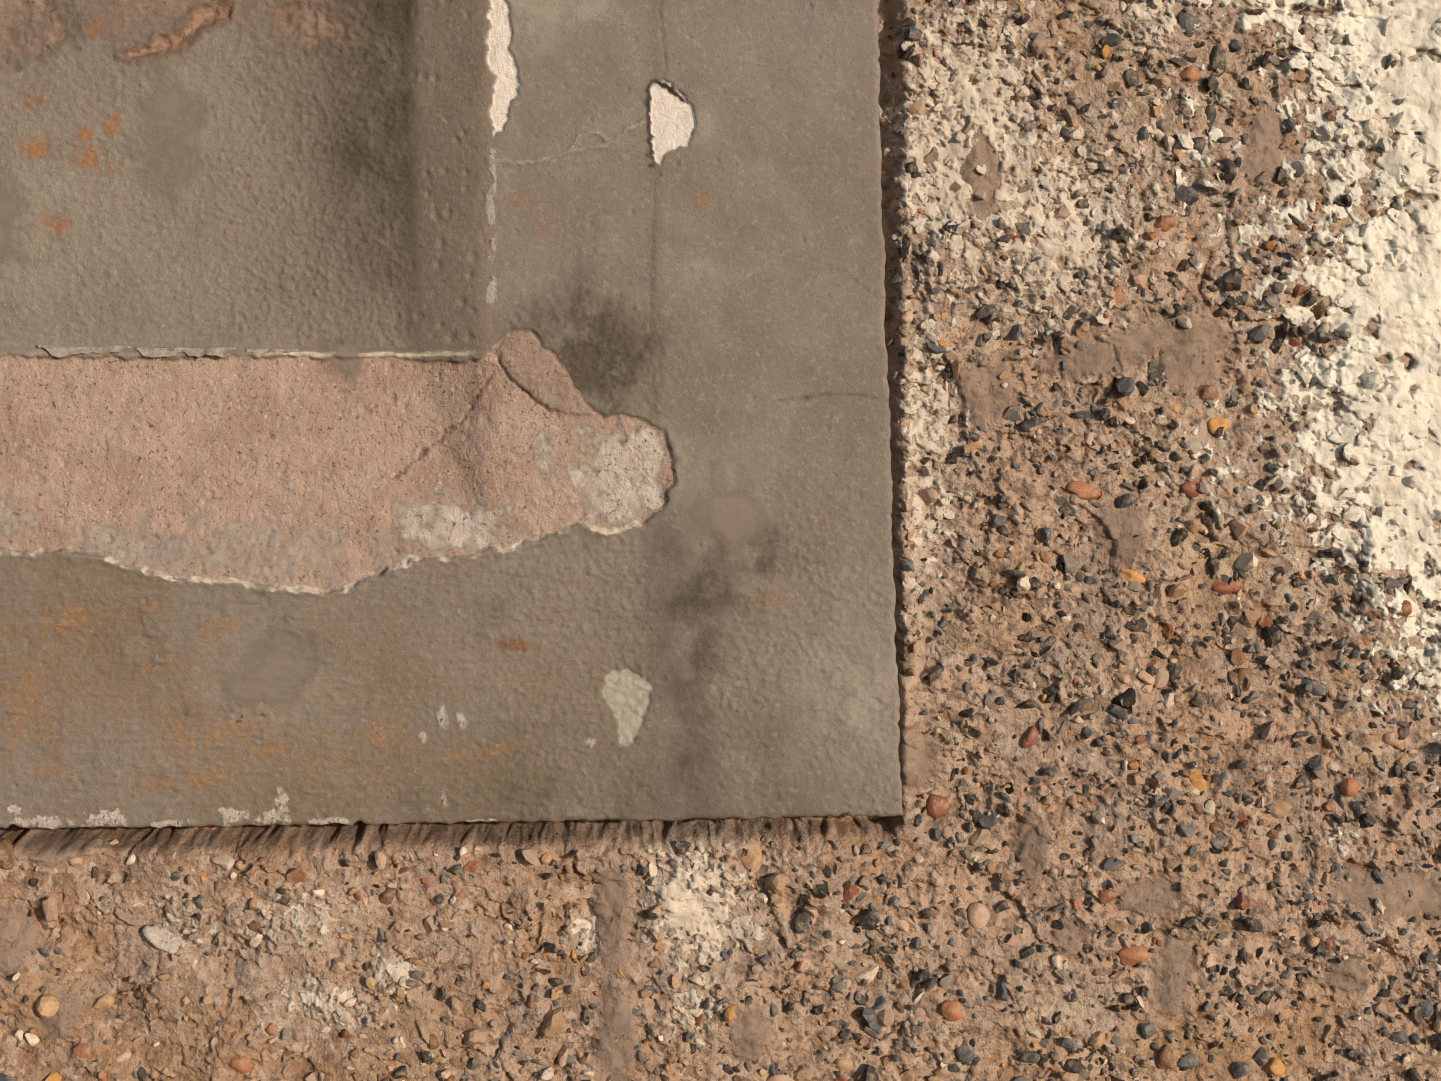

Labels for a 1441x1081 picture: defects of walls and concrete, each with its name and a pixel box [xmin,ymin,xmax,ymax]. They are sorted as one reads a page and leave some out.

spalling [0,0,67,66]
spalling [295,0,351,46]
spalling [485,0,521,304]
crack [488,120,645,164]
spalling [646,79,696,166]
peeling [0,328,676,594]
spalling [602,668,653,747]
spalling [4,804,127,829]
spalling [151,819,190,828]
spalling [218,787,350,827]